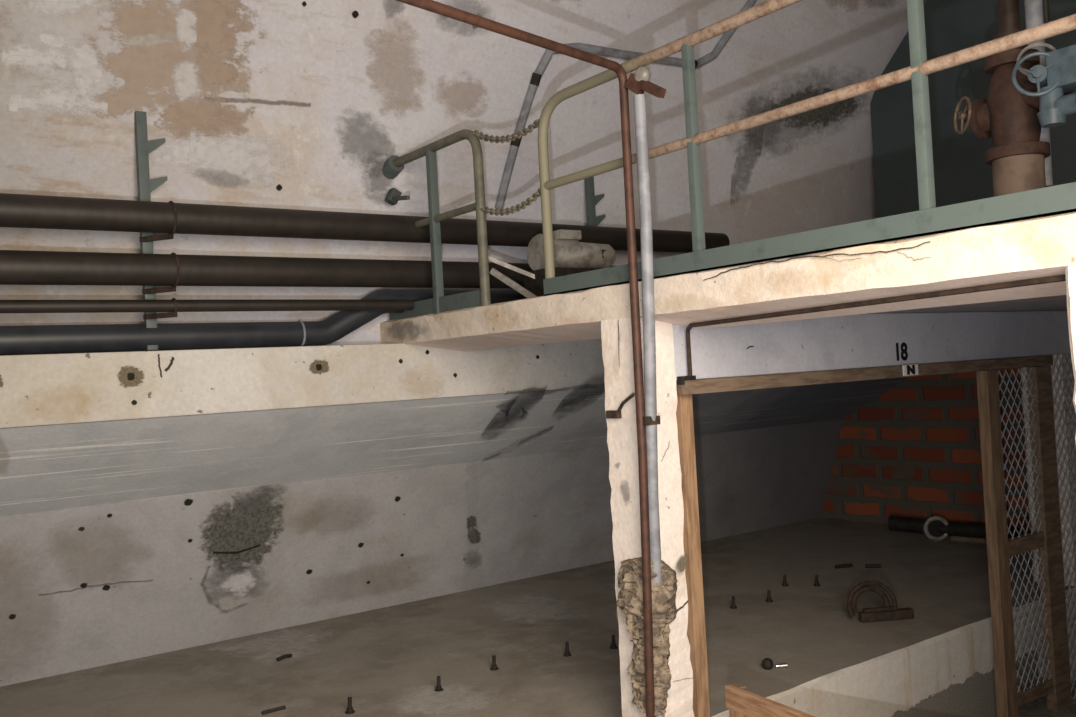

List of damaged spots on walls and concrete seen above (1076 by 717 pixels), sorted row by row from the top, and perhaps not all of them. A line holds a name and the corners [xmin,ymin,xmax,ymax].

peeling [88,0,254,140]
water stain [772,86,857,128]
crack [703,241,930,281]
spalling [617,555,688,715]
peeling [892,668,997,717]
peeling [1016,650,1039,691]